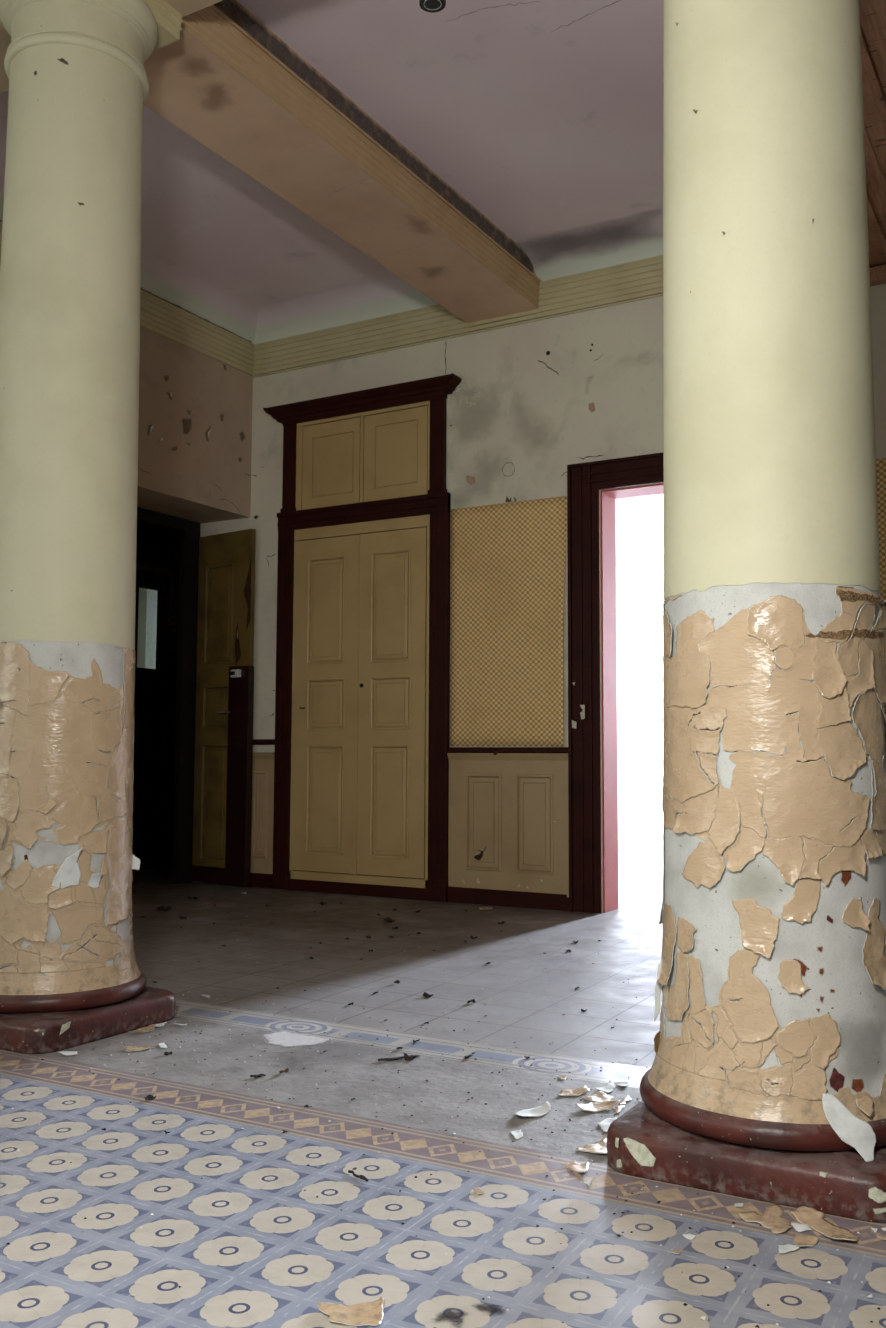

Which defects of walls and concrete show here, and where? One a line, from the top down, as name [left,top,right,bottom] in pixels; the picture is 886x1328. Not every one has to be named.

peeling [0,642,141,995]
peeling [648,586,886,1162]
spalling [561,1081,656,1186]